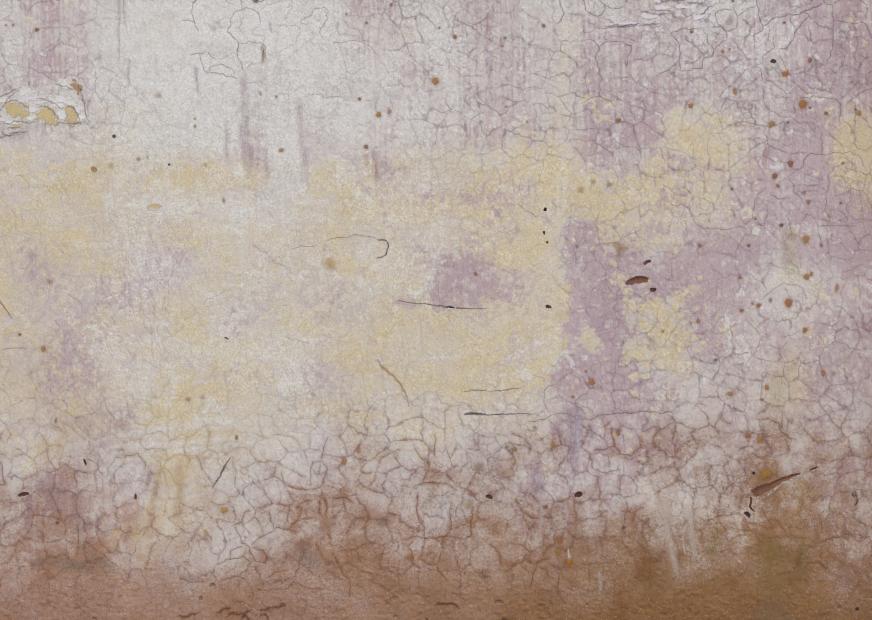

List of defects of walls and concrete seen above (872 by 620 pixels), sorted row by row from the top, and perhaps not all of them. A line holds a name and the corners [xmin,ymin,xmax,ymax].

peeling [609,0,714,27]
peeling [0,78,91,140]
spalling [626,260,656,297]
spalling [744,473,800,518]